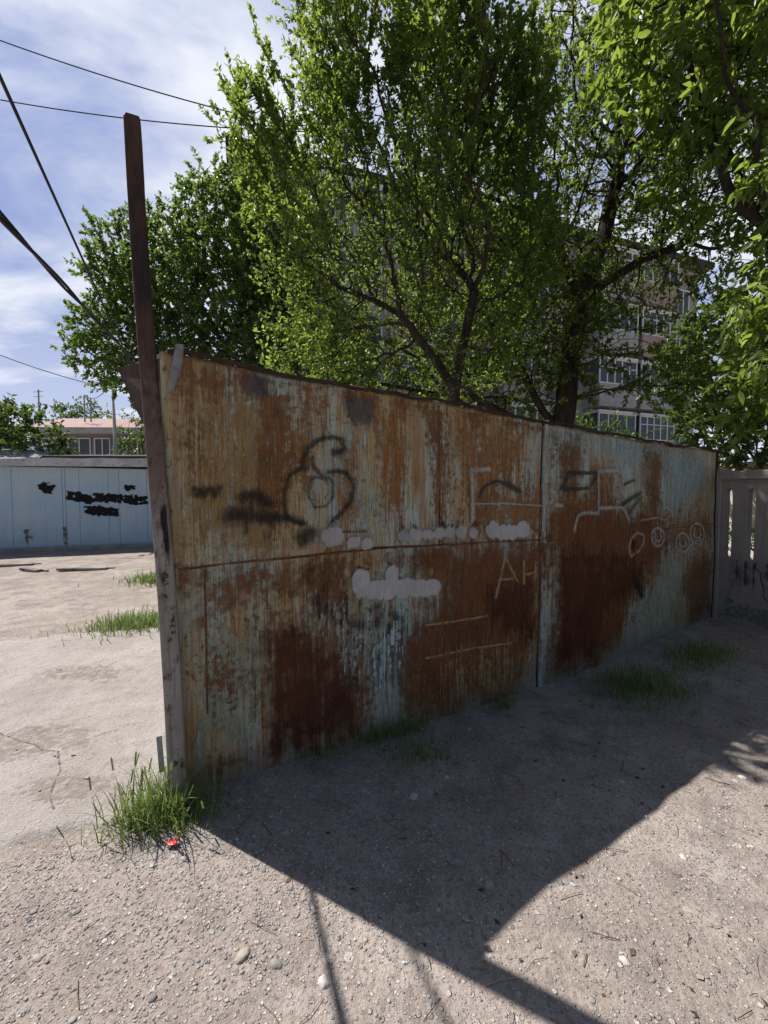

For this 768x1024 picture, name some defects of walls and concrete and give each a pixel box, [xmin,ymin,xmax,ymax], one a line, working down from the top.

peeling [316,591,376,676]
corrosion [177,361,715,784]